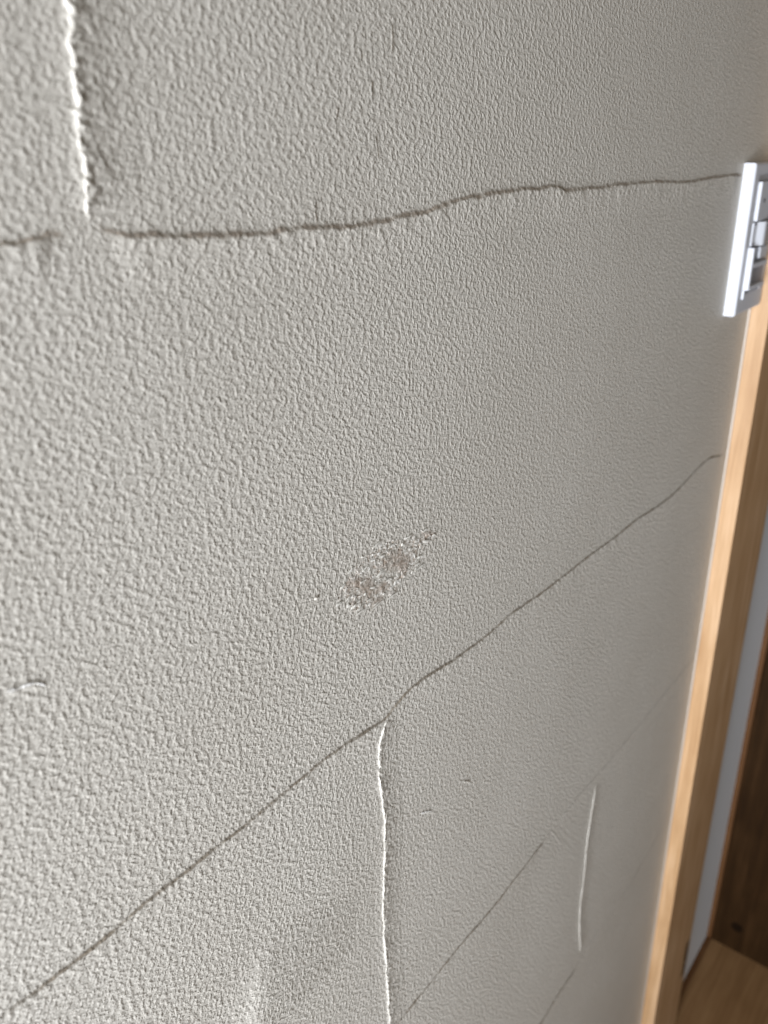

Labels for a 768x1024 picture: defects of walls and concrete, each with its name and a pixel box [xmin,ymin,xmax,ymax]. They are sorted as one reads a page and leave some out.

crack [0,229,59,300]
crack [39,0,741,292]
crack [0,453,720,1024]